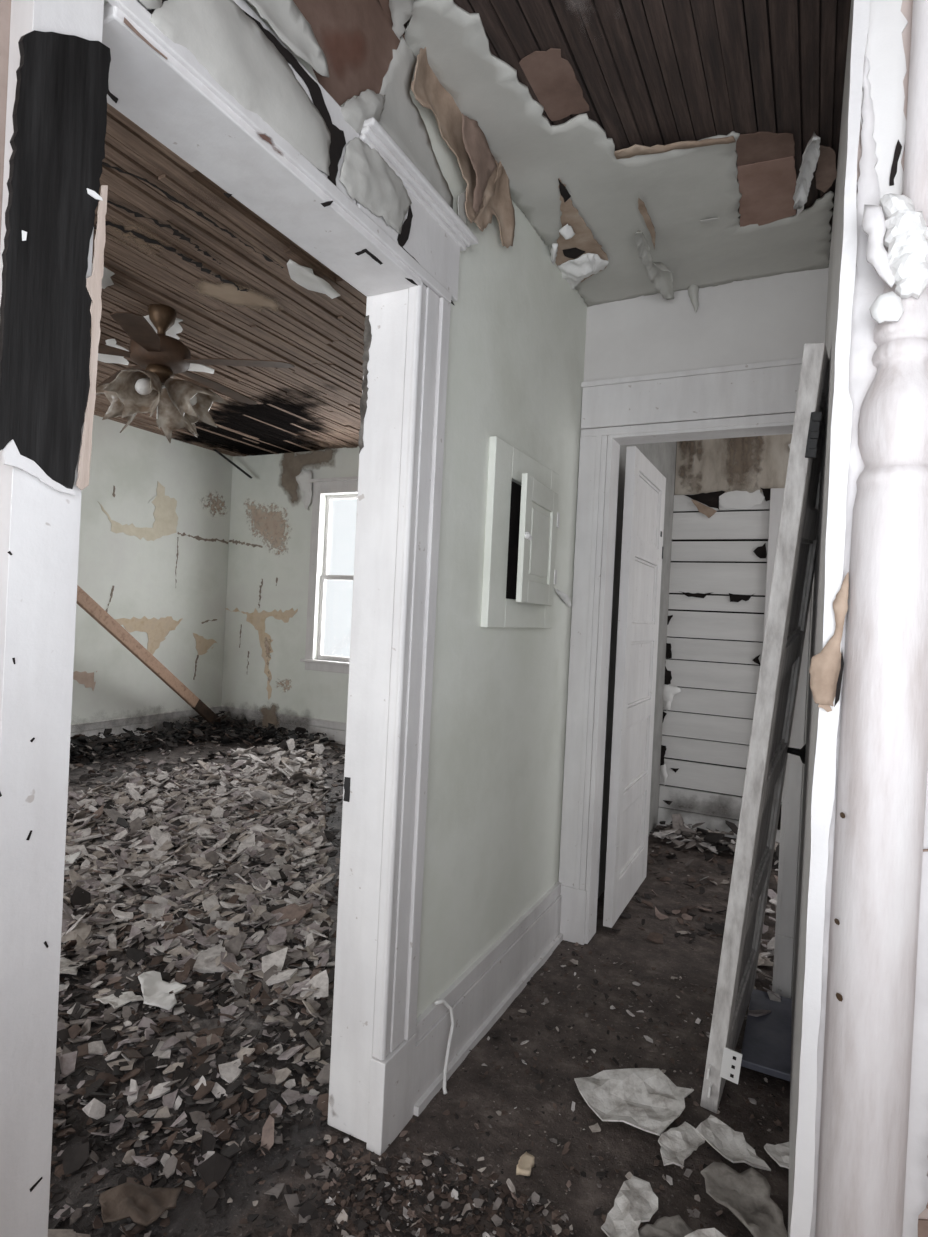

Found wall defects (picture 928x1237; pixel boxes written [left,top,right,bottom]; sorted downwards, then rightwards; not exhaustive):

flaking render [293,0,405,107]
flaking render [519,48,590,121]
flaking render [736,132,797,227]
peeling [355,249,383,265]
peeling [842,0,928,583]
peeling [2,440,75,495]
water stain [680,441,702,490]
water stain [727,436,763,484]
peeling [810,613,847,1237]
peeling [902,770,928,1237]